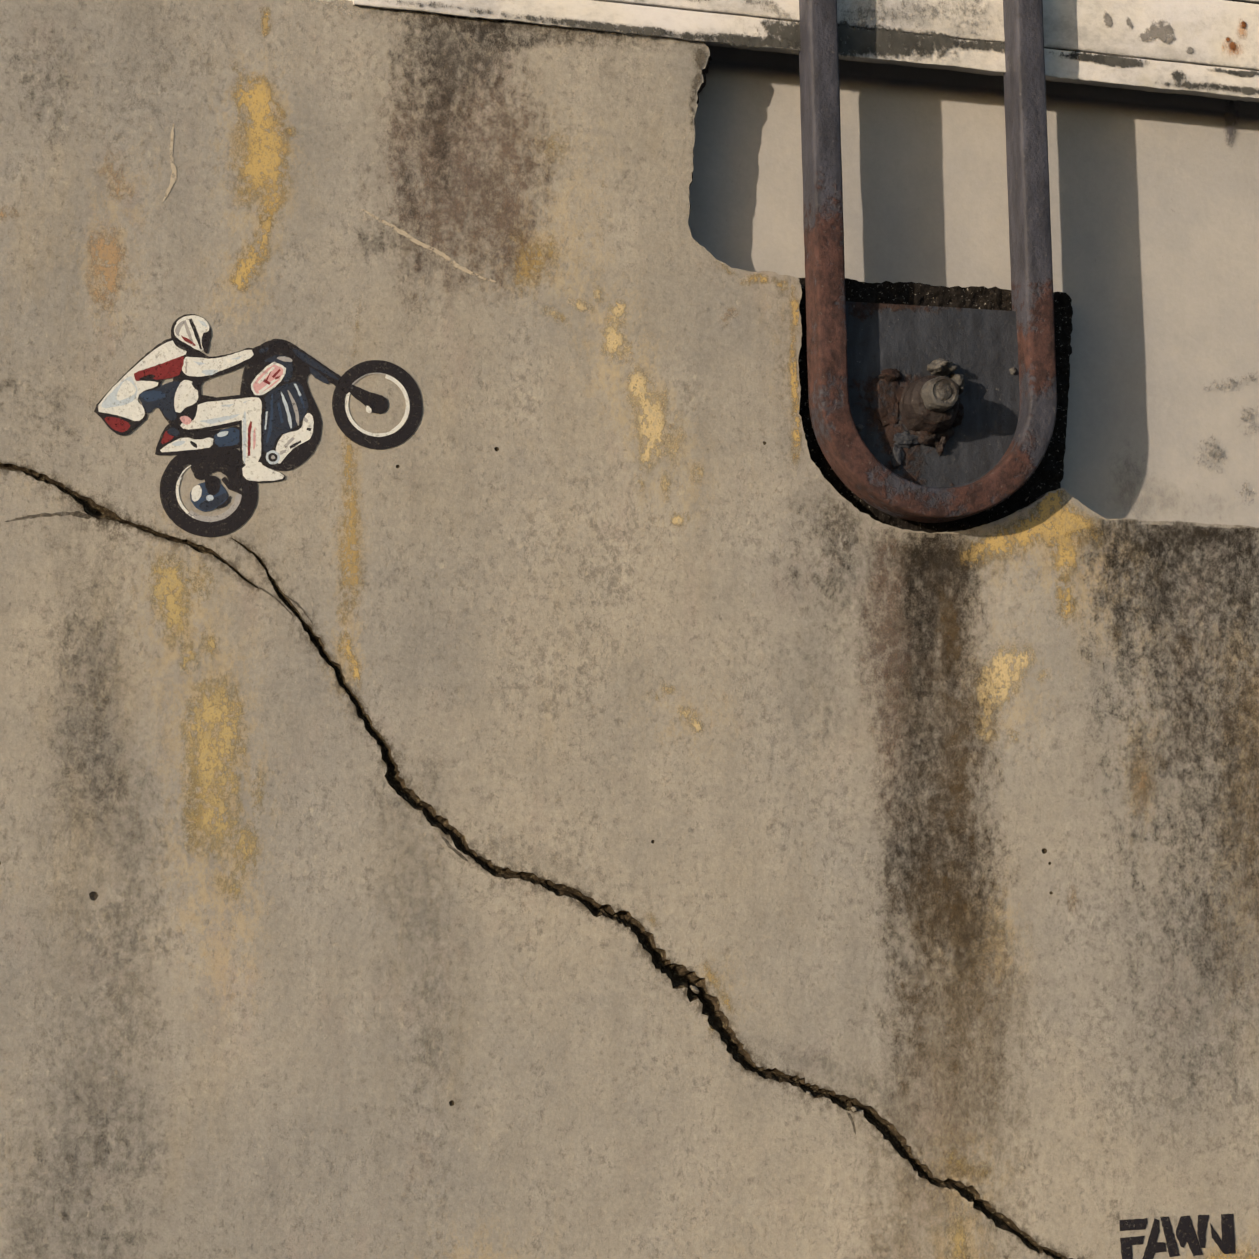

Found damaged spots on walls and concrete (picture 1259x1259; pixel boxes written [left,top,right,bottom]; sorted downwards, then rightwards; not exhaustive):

damp [388,0,801,286]
spalling [690,44,712,125]
damp [838,0,1005,61]
damp [1062,51,1146,68]
damp [1165,68,1259,145]
peeling [576,289,631,357]
peeling [748,274,799,326]
peeling [627,368,682,468]
peeling [789,341,800,459]
rust [869,358,966,470]
crack [0,462,1073,1259]
damp [862,532,1009,1096]